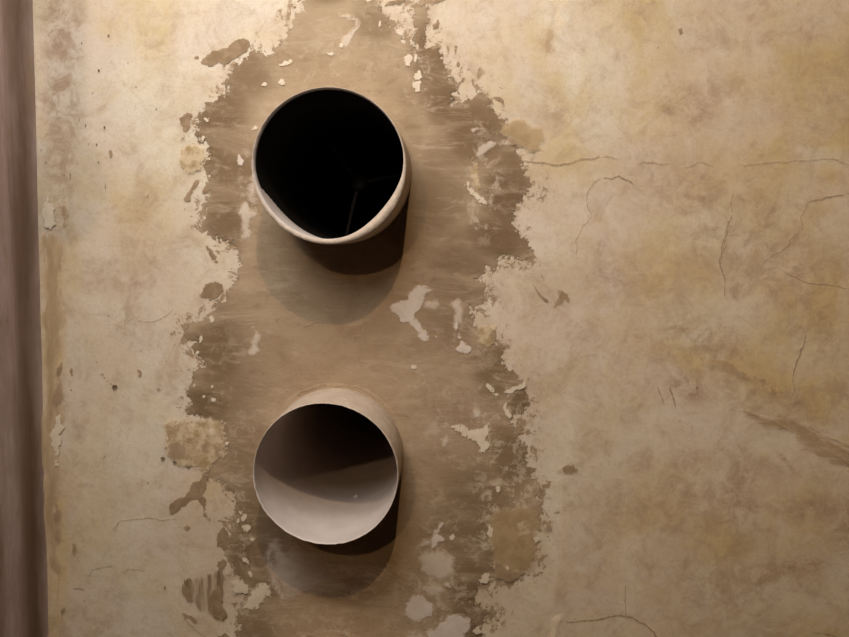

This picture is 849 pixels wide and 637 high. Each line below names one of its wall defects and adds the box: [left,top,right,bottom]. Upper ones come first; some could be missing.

crack [522,156,712,252]
flaking render [161,418,227,471]
crack [569,587,657,637]